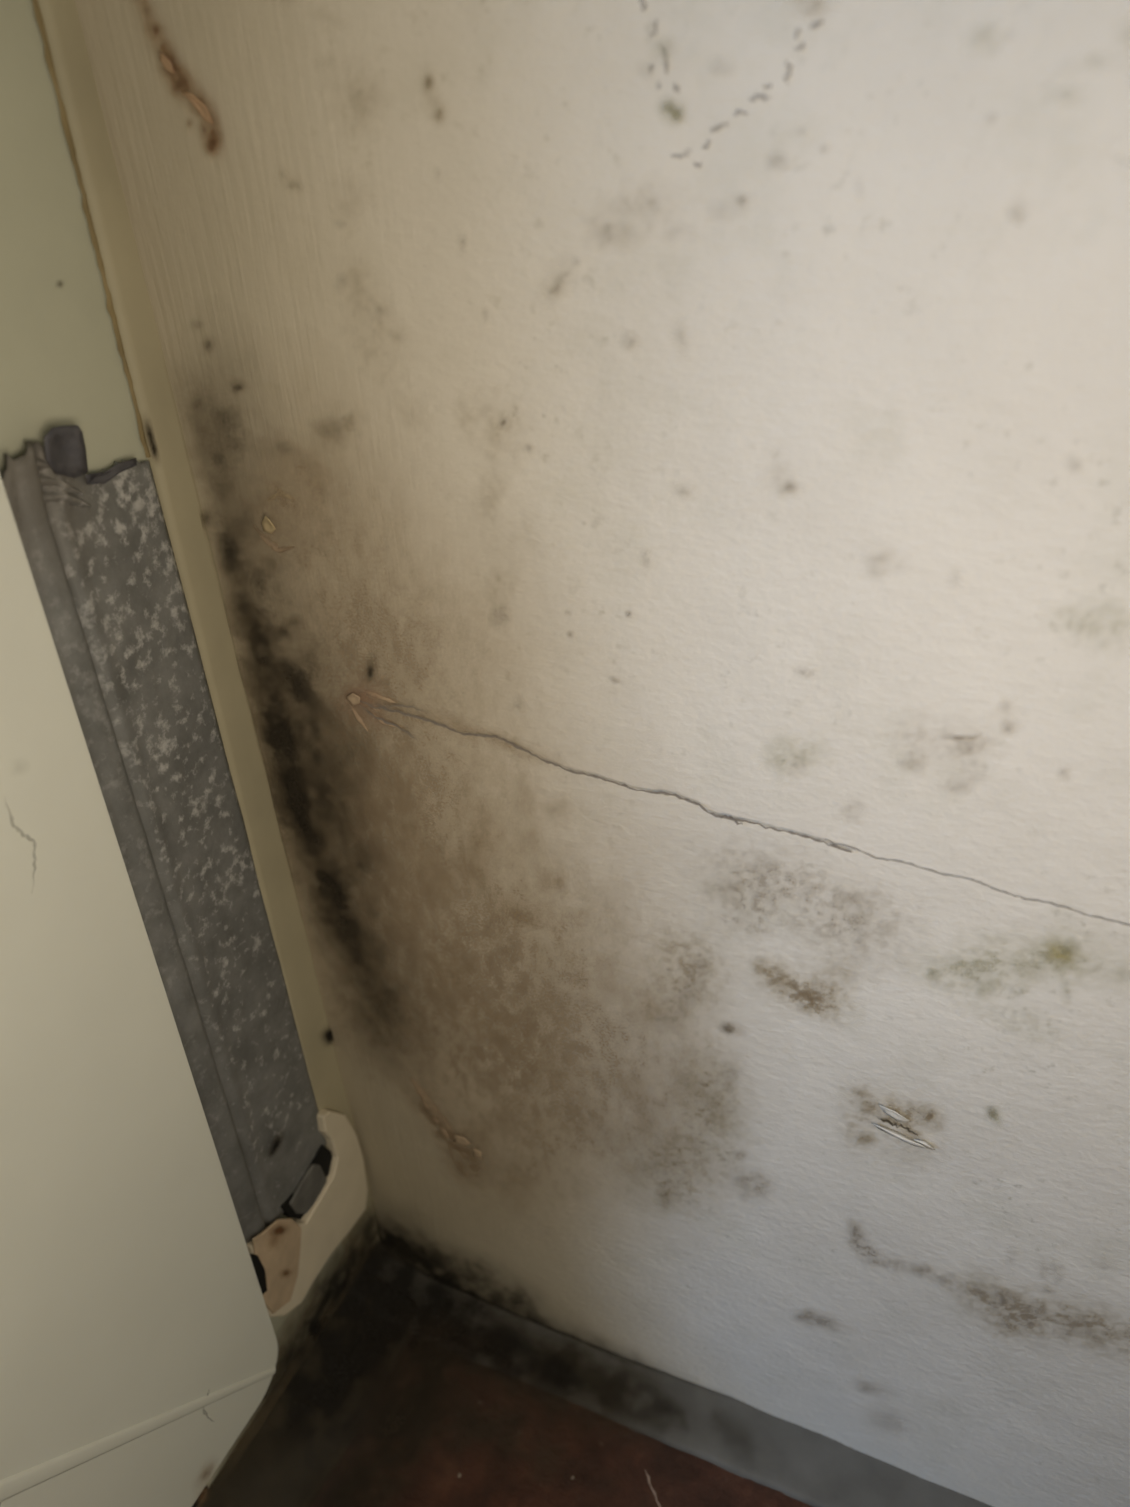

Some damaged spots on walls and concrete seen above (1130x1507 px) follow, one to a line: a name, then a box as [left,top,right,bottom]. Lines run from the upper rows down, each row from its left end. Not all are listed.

rust [153,26,219,151]
water stain [220,484,681,1180]
crack [360,701,1130,926]
water stain [764,967,833,1014]
water stain [971,1290,1111,1335]